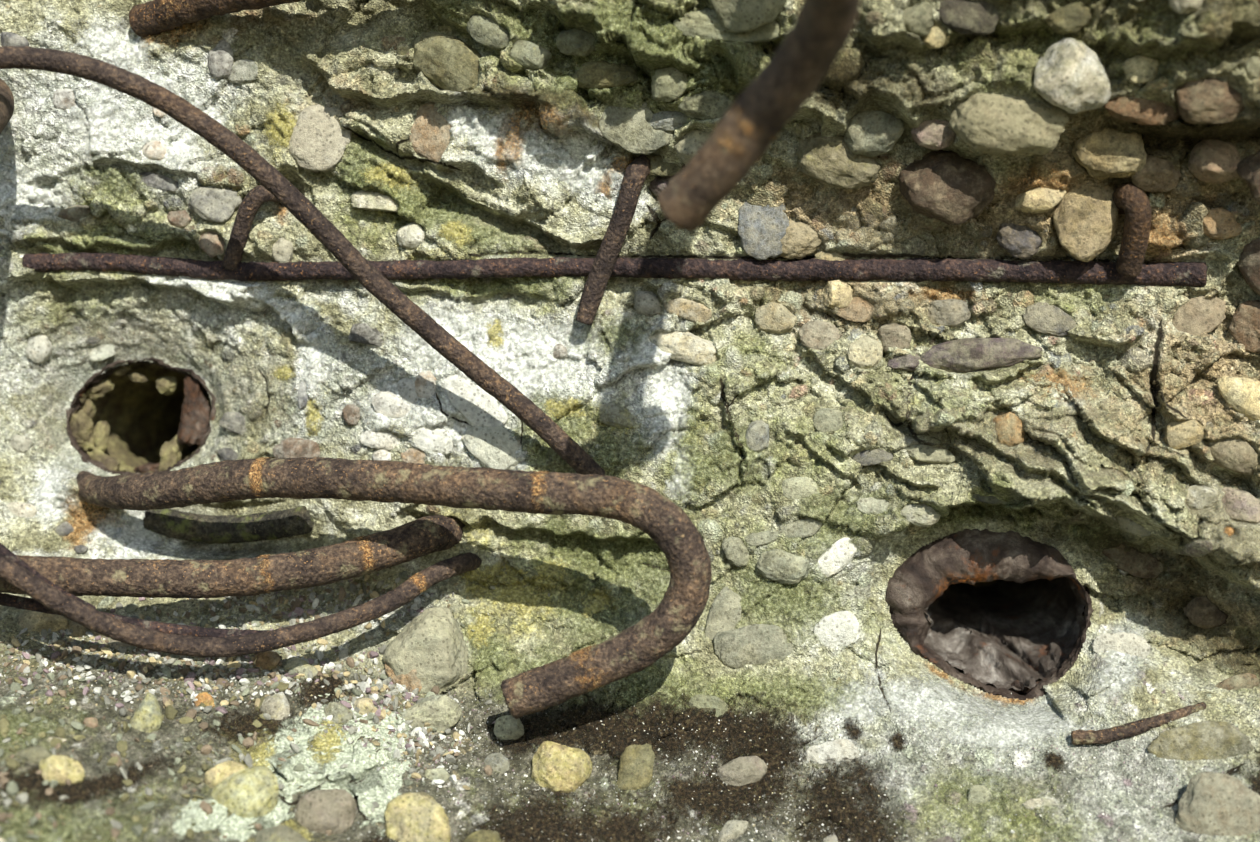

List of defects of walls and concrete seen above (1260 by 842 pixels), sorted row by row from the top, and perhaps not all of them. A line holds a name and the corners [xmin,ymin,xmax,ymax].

corrosion [600,155,632,197]
crack [1129,320,1187,469]
corrosion [249,457,275,500]
corrosion [531,471,547,512]
corrosion [66,496,108,545]
corrosion [354,535,374,570]
corrosion [407,573,426,591]
peeling [465,560,617,618]
corrosion [985,680,1045,704]